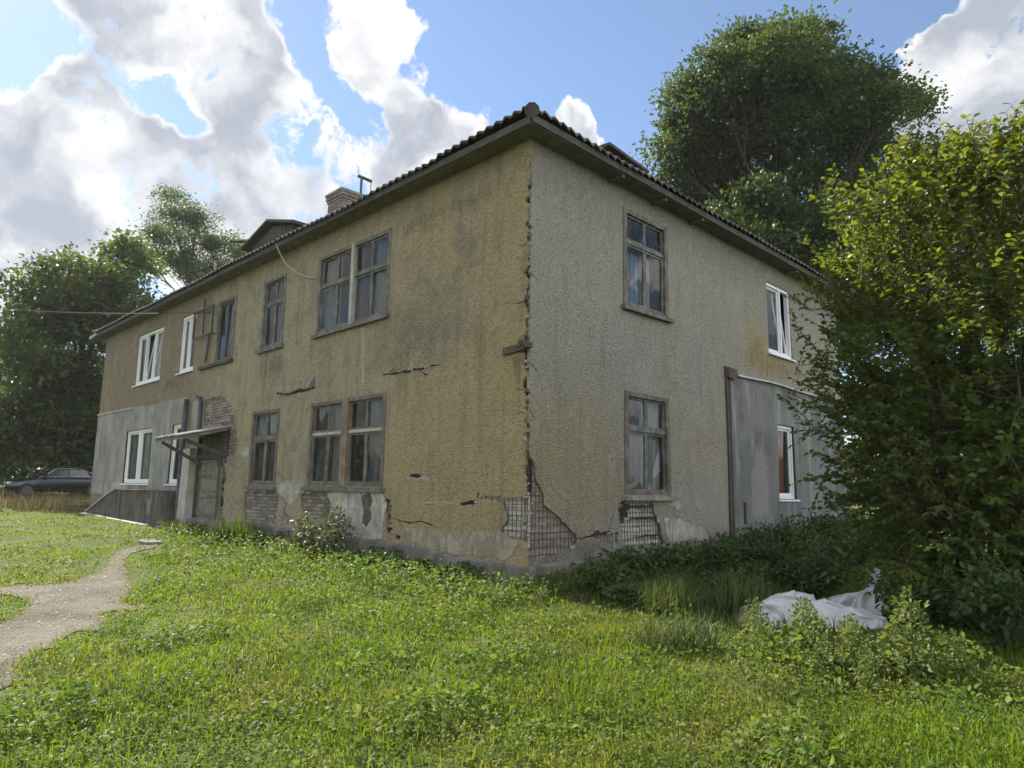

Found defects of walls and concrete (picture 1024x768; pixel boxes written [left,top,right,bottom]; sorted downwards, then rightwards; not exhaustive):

crack [516,164,539,497]
crack [383,364,438,376]
spalling [201,397,238,469]
spalling [243,490,279,526]
crack [393,477,459,527]
spalling [462,422,579,559]